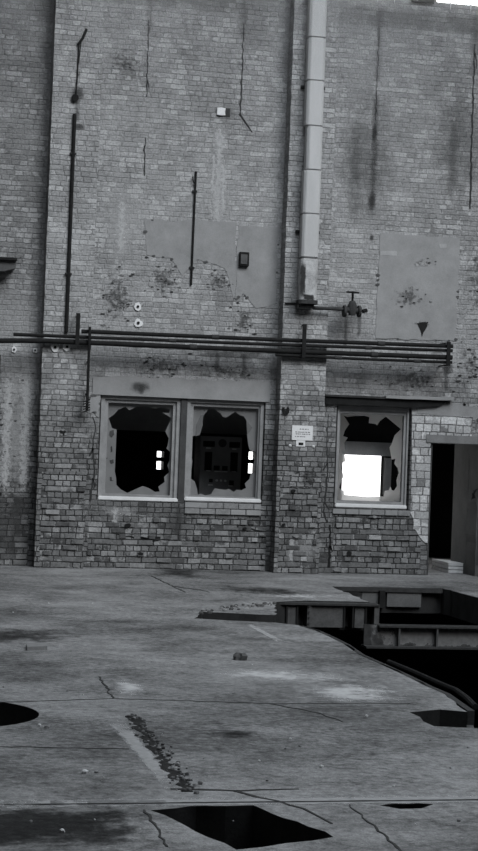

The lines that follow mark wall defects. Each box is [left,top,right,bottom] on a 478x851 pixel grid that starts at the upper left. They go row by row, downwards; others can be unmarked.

crack [144,20,152,97]
crack [239,24,252,132]
crack [373,43,381,121]
crack [469,44,477,209]